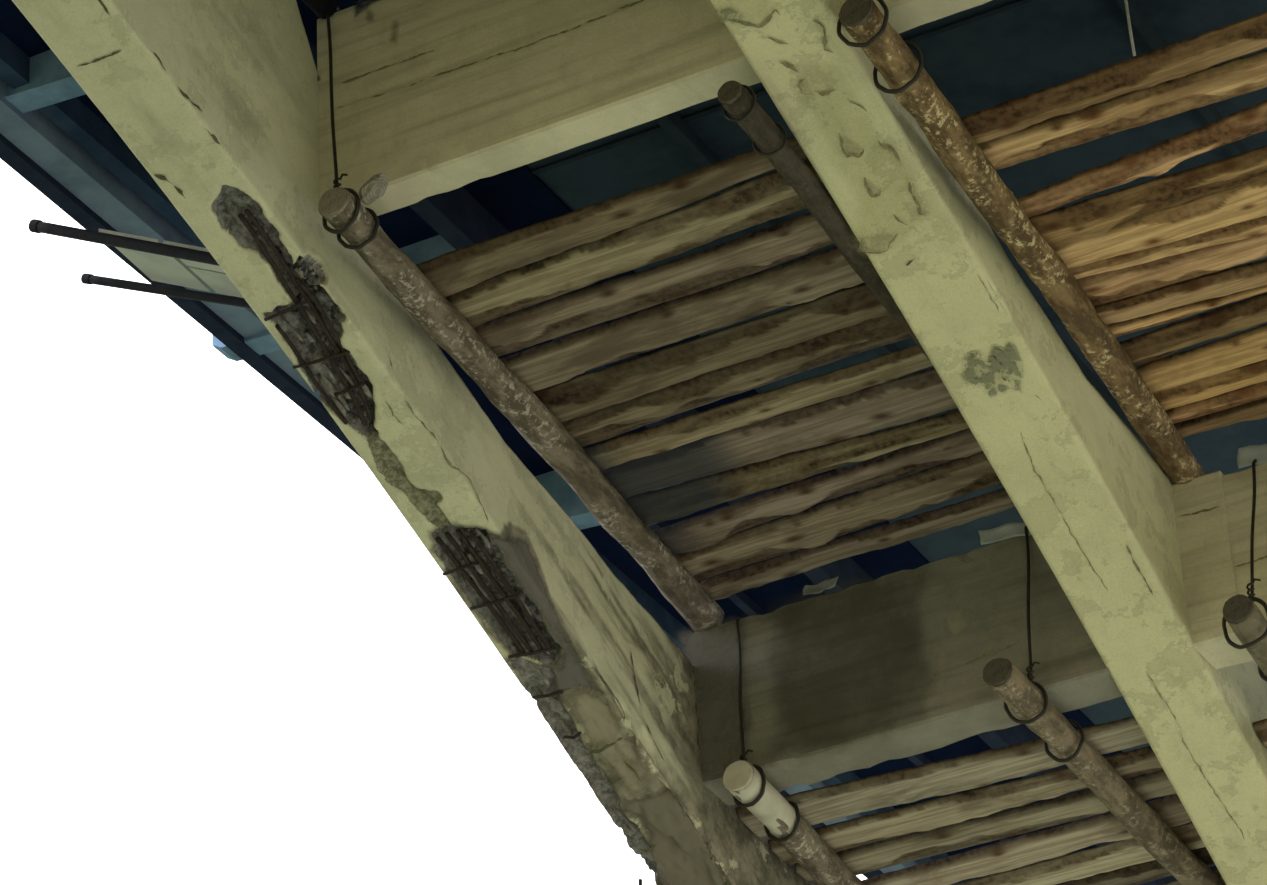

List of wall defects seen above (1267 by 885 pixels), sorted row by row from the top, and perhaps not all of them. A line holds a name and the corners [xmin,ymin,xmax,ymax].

peeling [720,9,787,44]
peeling [780,62,835,96]
peeling [962,344,1021,397]
spalling [212,185,726,885]
crack [1021,433,1108,590]
damp [682,621,747,776]
crack [1147,674,1245,840]